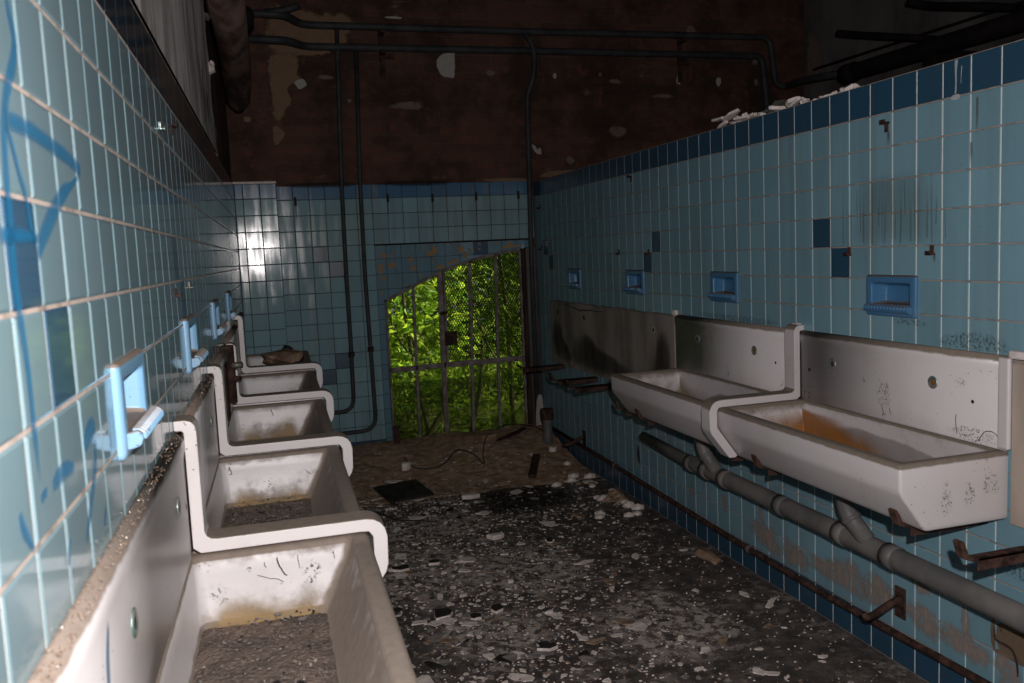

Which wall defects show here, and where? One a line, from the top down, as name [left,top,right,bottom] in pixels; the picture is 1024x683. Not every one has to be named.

flaking render [264,4,355,121]